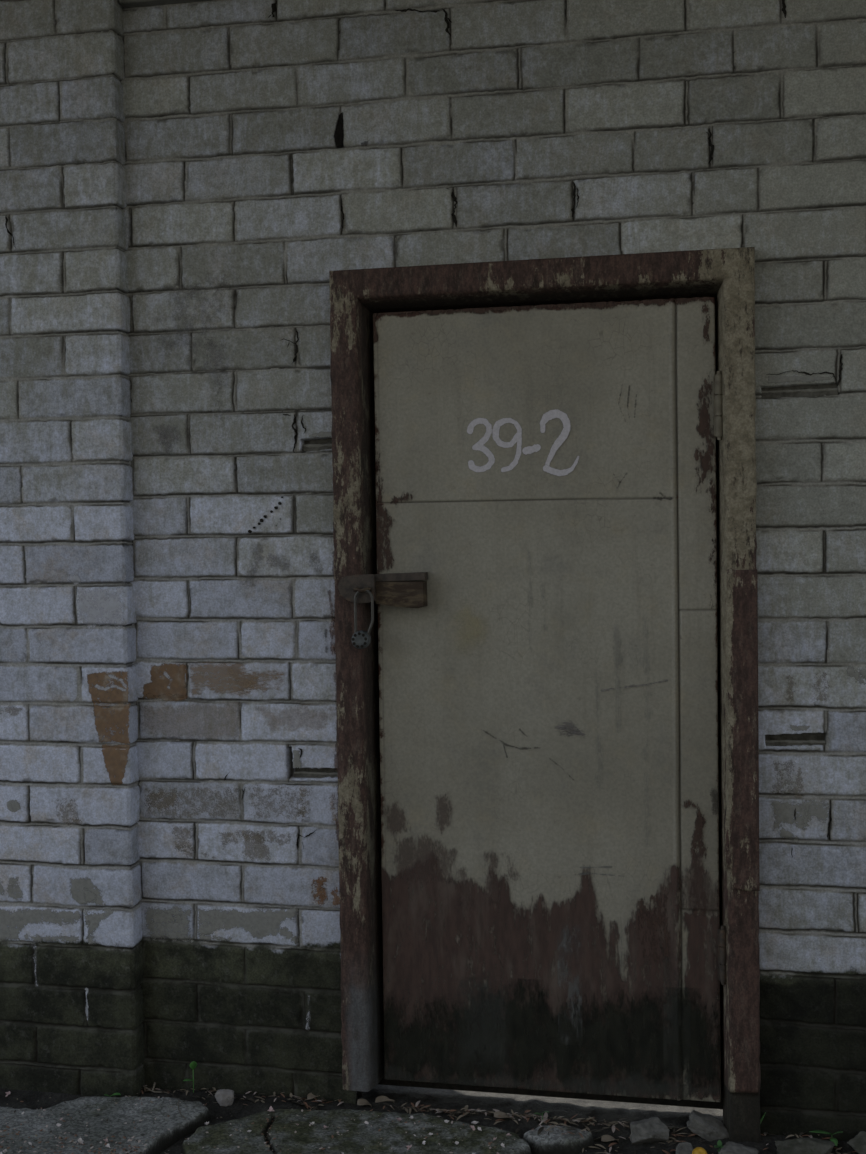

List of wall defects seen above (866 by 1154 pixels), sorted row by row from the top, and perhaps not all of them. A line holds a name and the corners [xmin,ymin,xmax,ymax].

spalling [293,750,338,778]
peeling [7,800,20,812]
peeling [0,877,113,945]
peeling [145,906,299,944]
corrosion [382,786,720,1100]
crack [265,1116,275,1153]